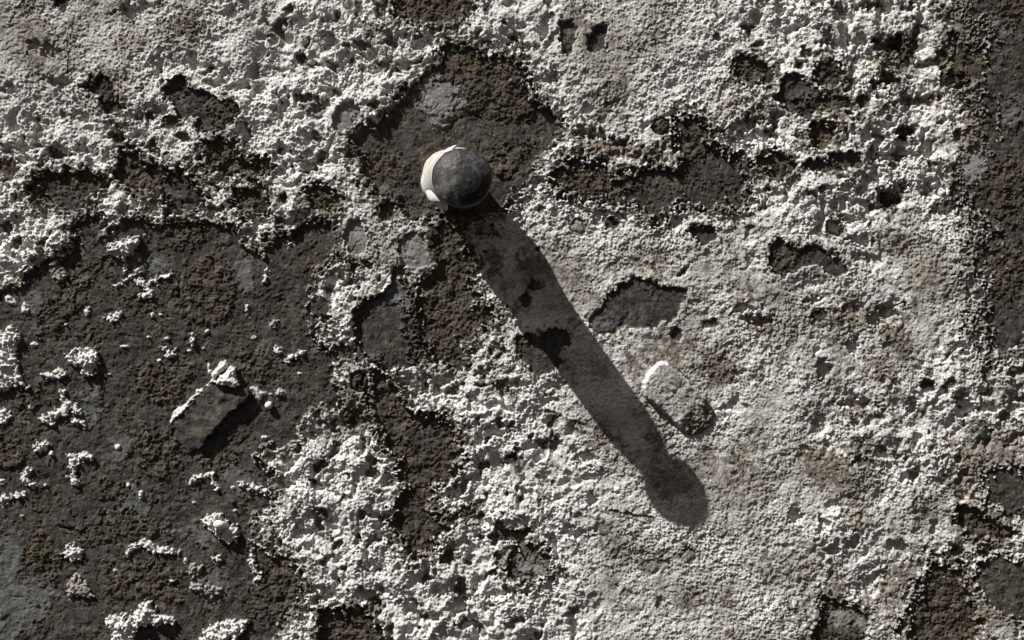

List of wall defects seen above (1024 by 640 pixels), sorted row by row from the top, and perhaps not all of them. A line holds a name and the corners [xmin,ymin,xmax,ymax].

peeling [0,37,572,640]
hole [570,218,589,238]
peeling [589,266,690,342]
peeling [540,51,872,231]
peeling [768,238,849,282]
peeling [875,0,1024,380]
peeling [810,594,875,640]
peeling [890,457,1024,640]